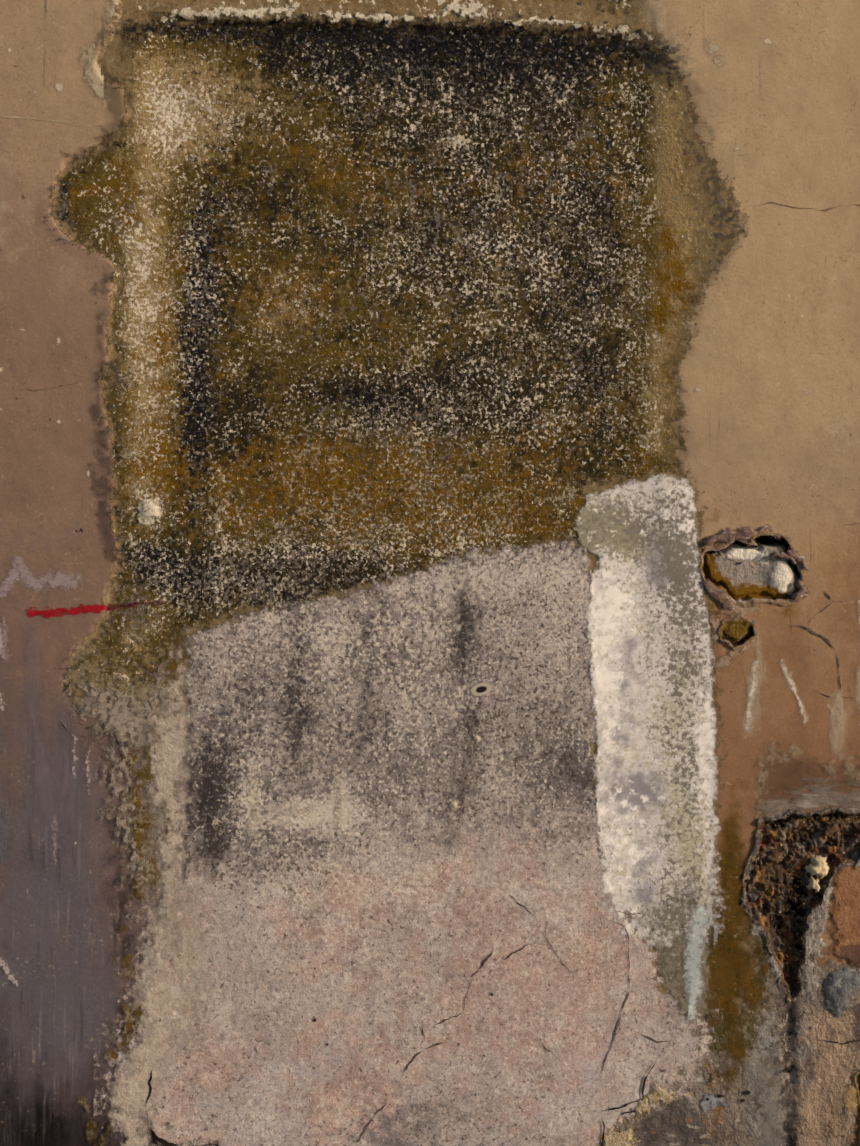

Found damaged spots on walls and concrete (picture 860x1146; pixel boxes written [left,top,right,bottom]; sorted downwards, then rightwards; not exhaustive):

crack [762,202,860,211]
peeling [50,0,811,975]
crack [788,591,859,706]
peeling [140,1096,219,1146]
crack [358,887,576,1141]
crack [599,910,676,1146]
peeling [597,807,860,1146]
water stain [705,823,772,1082]